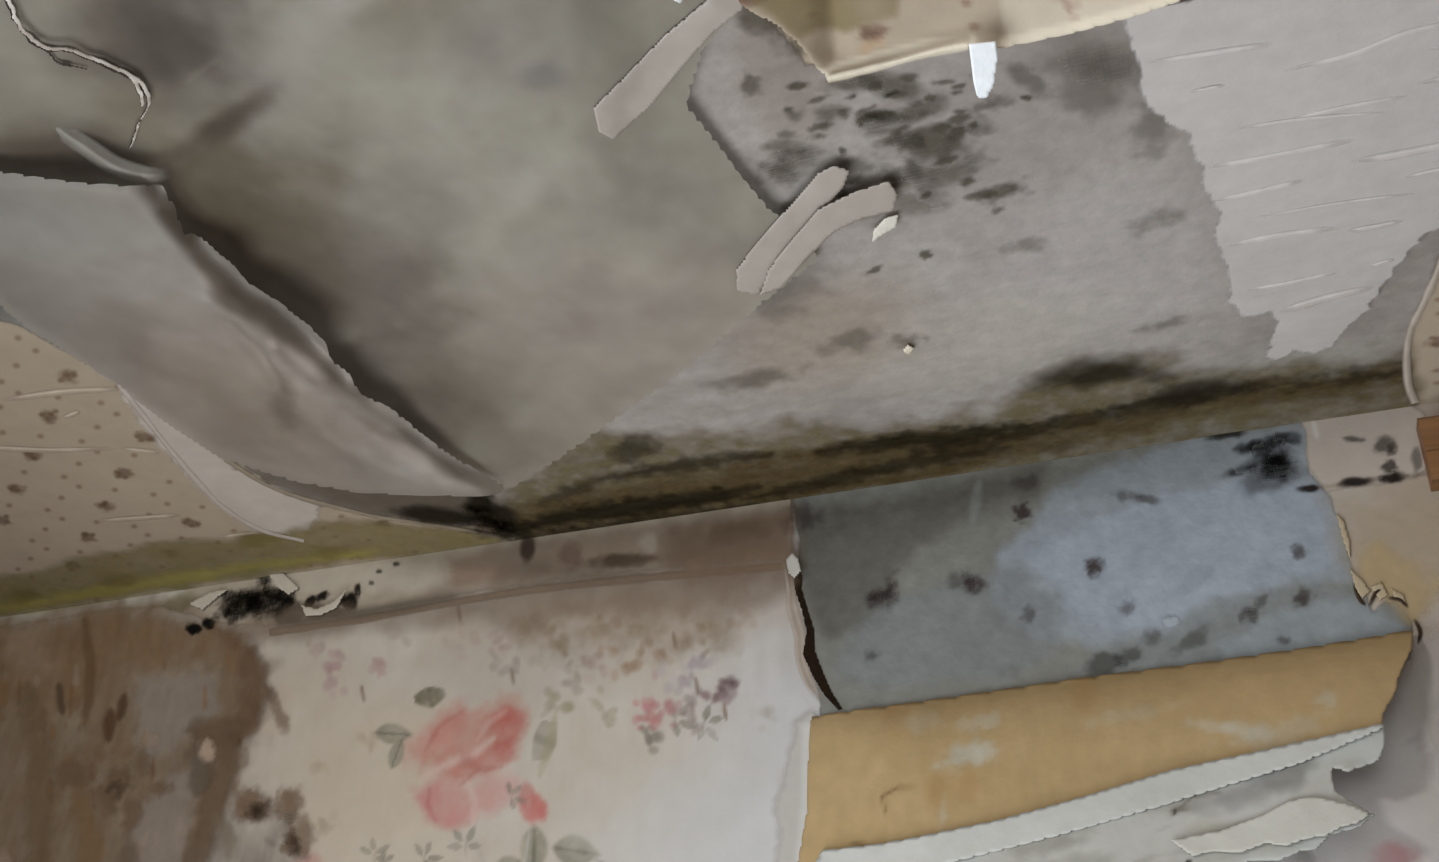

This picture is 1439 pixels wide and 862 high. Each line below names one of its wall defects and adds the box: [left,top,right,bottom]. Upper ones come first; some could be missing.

crack [4,0,151,148]
leakage [831,72,976,163]
leakage [963,179,1017,199]
peeling [578,0,1439,458]
peeling [0,306,65,351]
leakage [0,361,1418,862]
spalling [0,384,1426,715]
leakage [1357,530,1439,620]